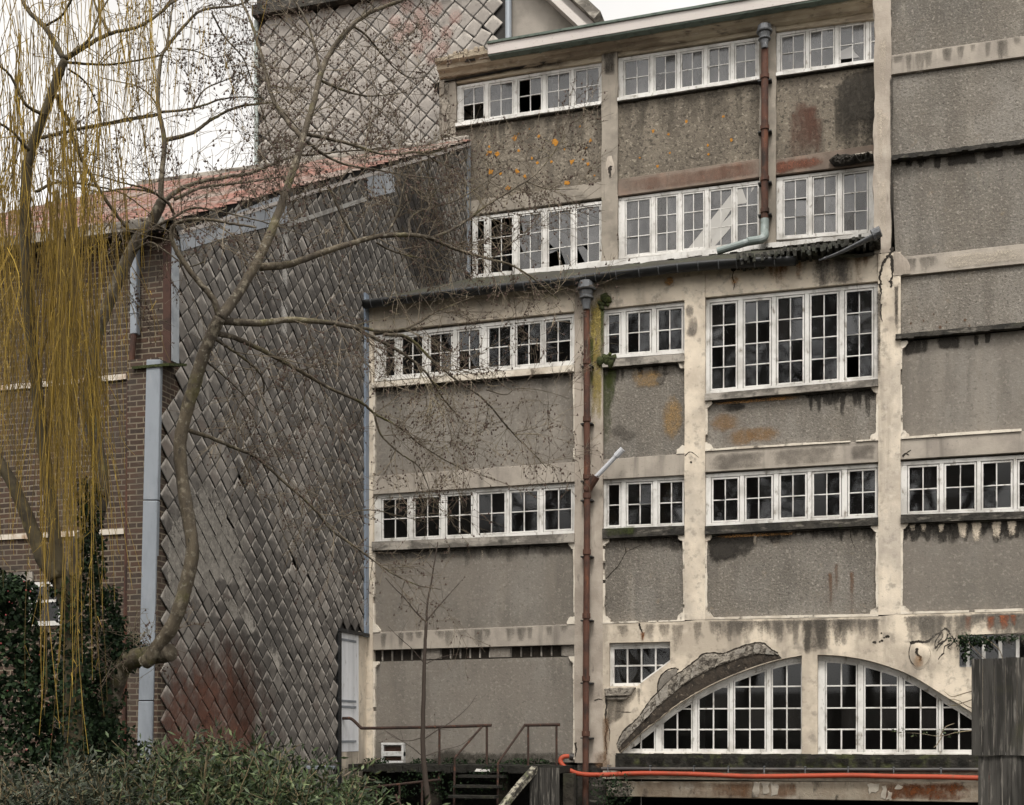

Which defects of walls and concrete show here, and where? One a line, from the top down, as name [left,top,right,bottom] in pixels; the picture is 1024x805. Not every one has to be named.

damp [776,41,973,145]
crack [878,247,894,321]
damp [590,299,680,440]
damp [712,387,875,415]
damp [903,519,1024,542]
damp [694,619,878,650]
peeling [867,783,903,801]